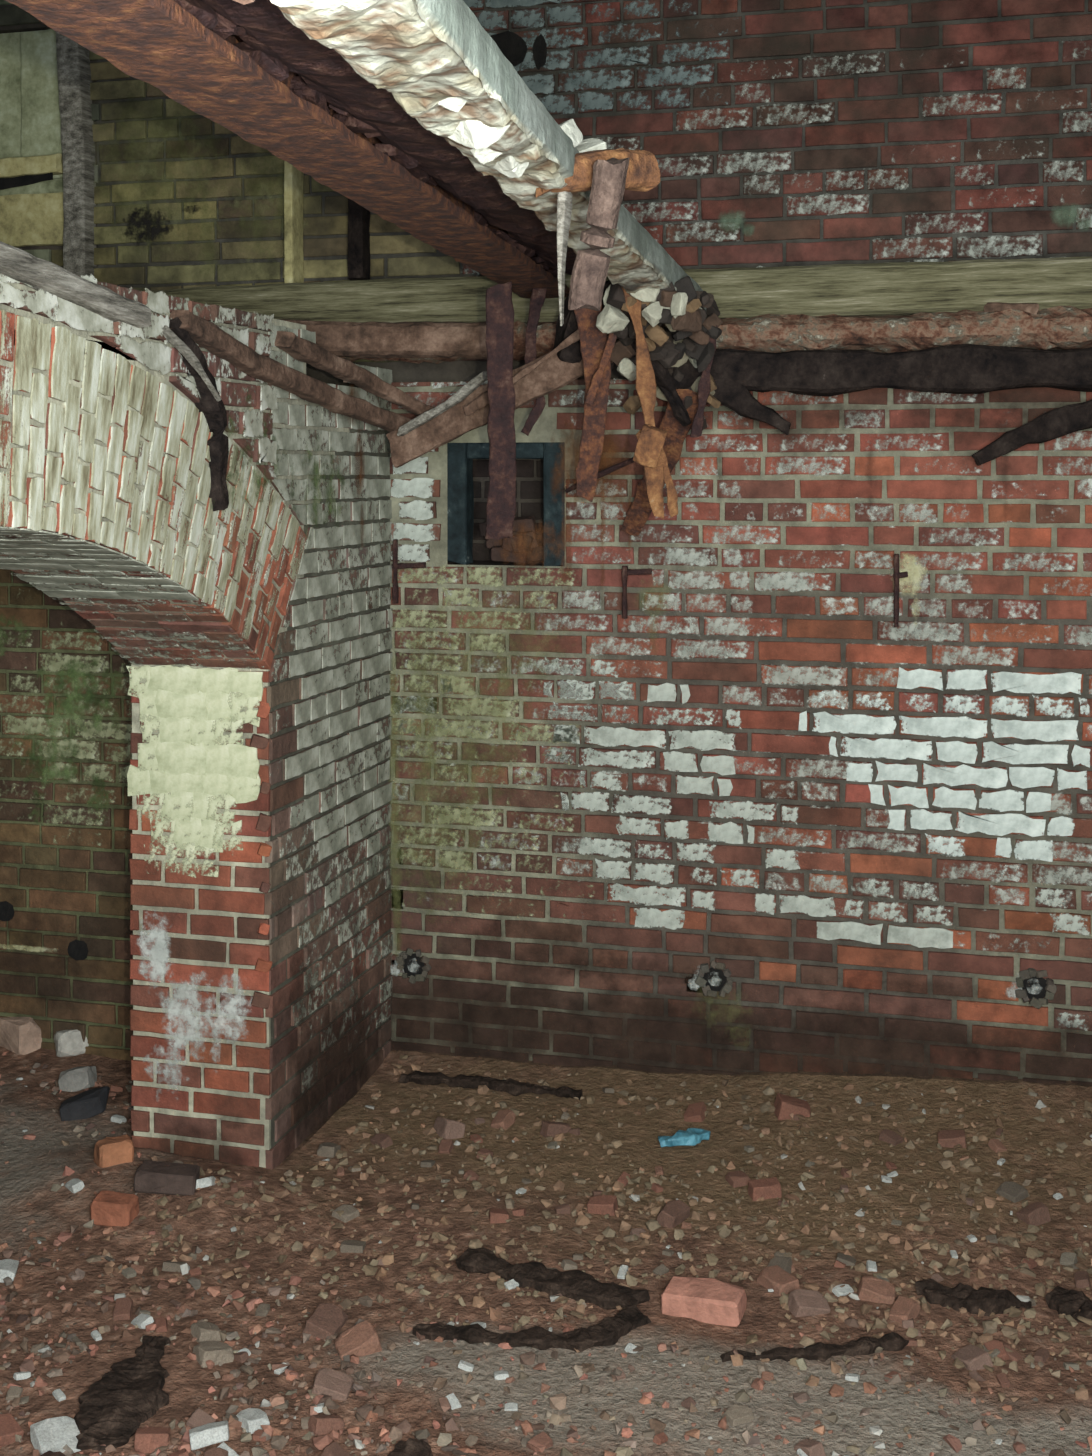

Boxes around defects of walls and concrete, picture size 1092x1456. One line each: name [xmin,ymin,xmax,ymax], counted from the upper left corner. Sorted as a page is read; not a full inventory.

peeling [932,67,1026,114]
peeling [1062,103,1091,131]
peeling [658,152,908,215]
peeling [1022,153,1083,181]
peeling [632,202,737,241]
peeling [875,202,1051,263]
peeling [0,274,1092,1093]